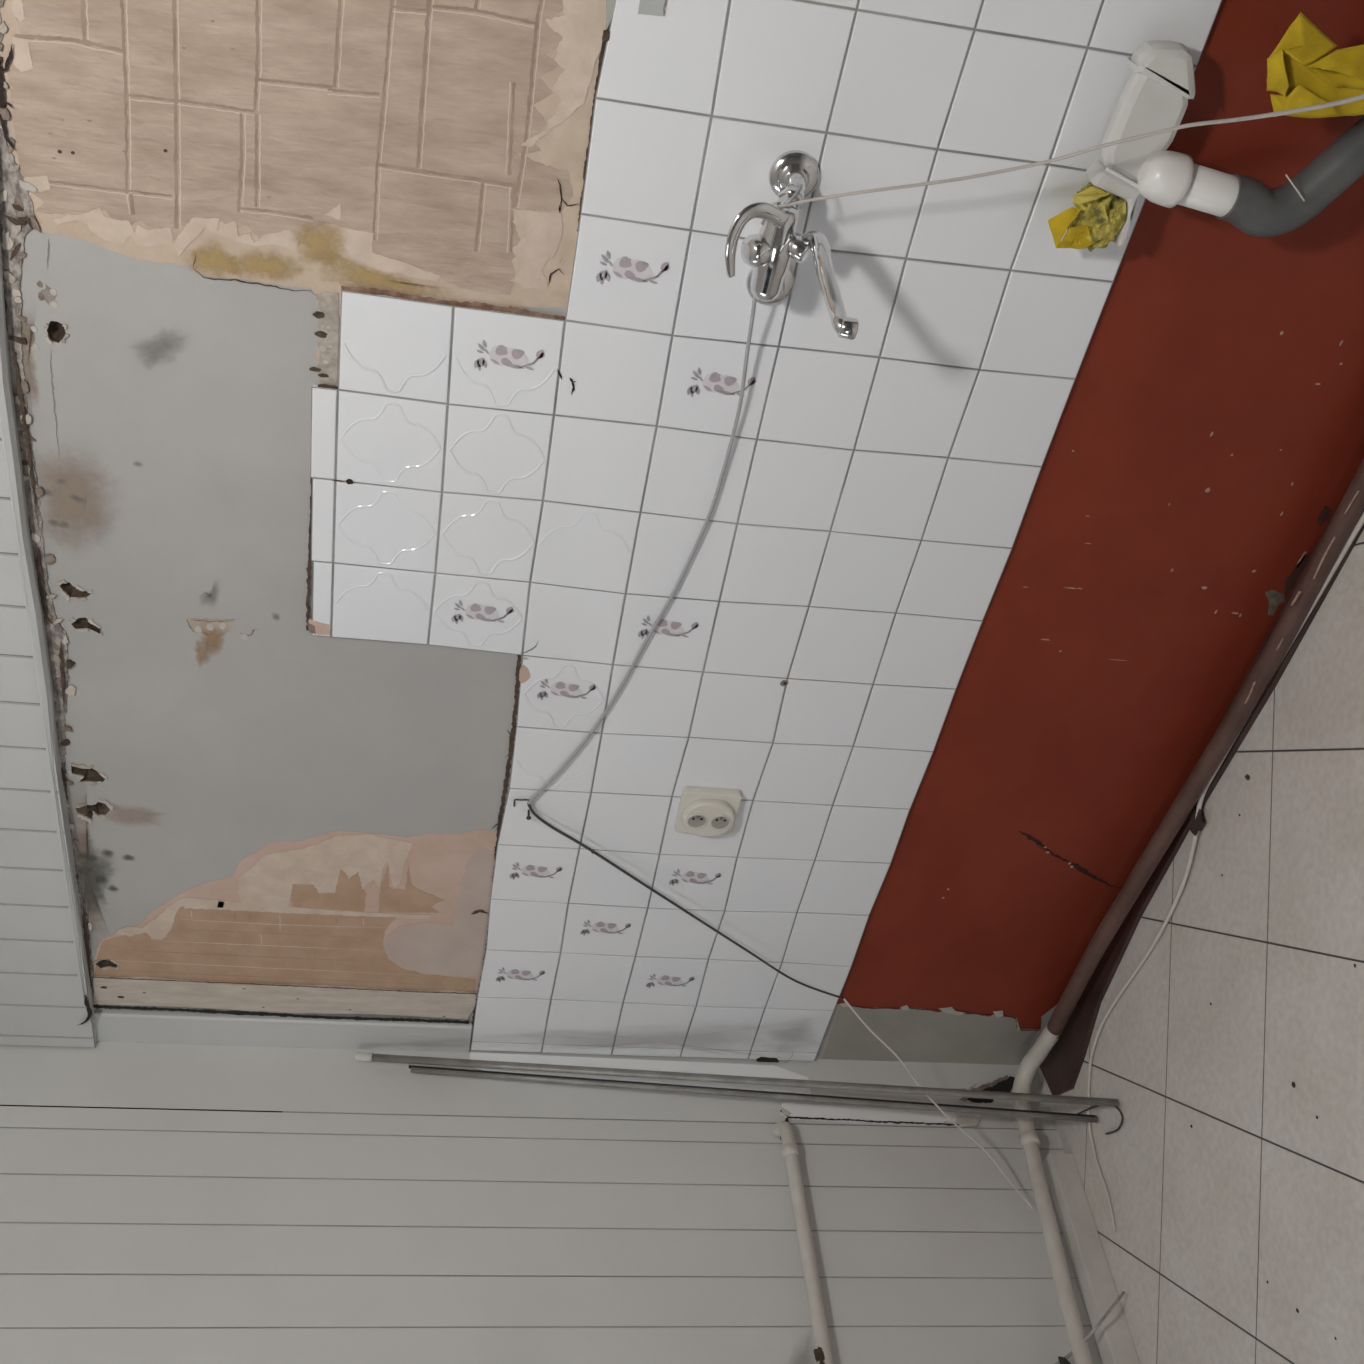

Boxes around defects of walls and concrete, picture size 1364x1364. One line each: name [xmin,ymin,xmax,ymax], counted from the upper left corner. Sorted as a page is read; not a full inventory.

spalling [0,0,8,65]
spalling [602,0,616,42]
flaking render [0,107,477,1024]
crack [1019,831,1121,888]